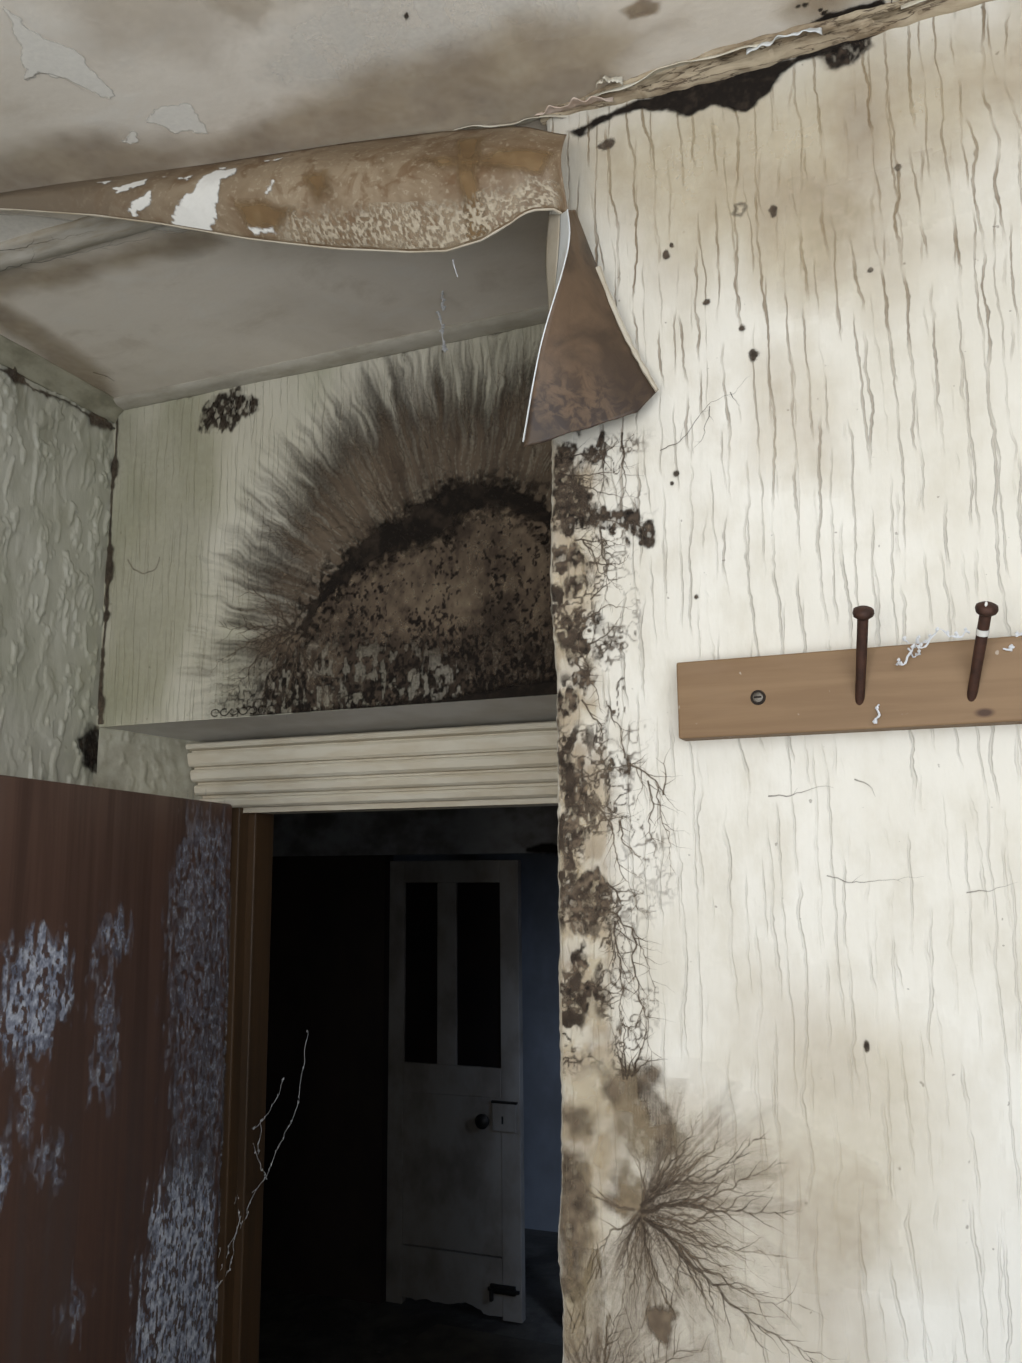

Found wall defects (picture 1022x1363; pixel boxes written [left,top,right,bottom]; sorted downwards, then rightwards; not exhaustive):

damp [627,0,656,17]
damp [571,37,871,137]
peeling [123,103,207,144]
peeling [452,114,568,131]
damp [597,139,614,150]
damp [199,386,258,433]
damp [222,364,604,940]
damp [560,960,813,1363]